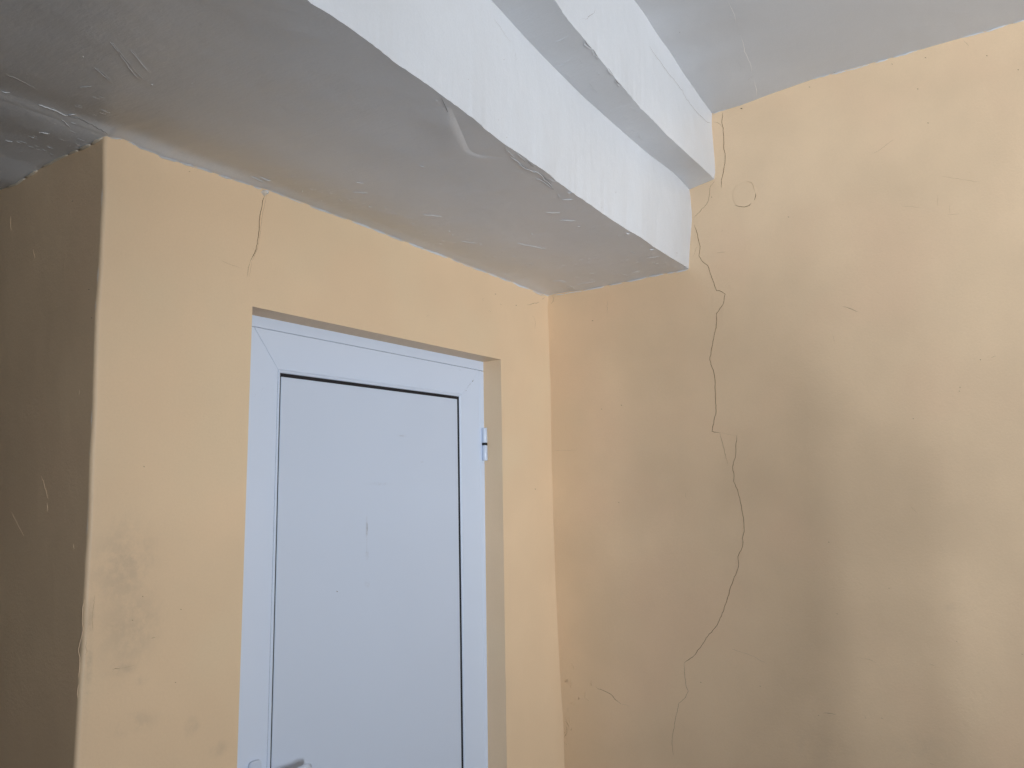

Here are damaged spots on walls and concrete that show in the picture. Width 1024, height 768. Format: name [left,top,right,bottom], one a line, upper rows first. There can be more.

crack [247,196,266,276]